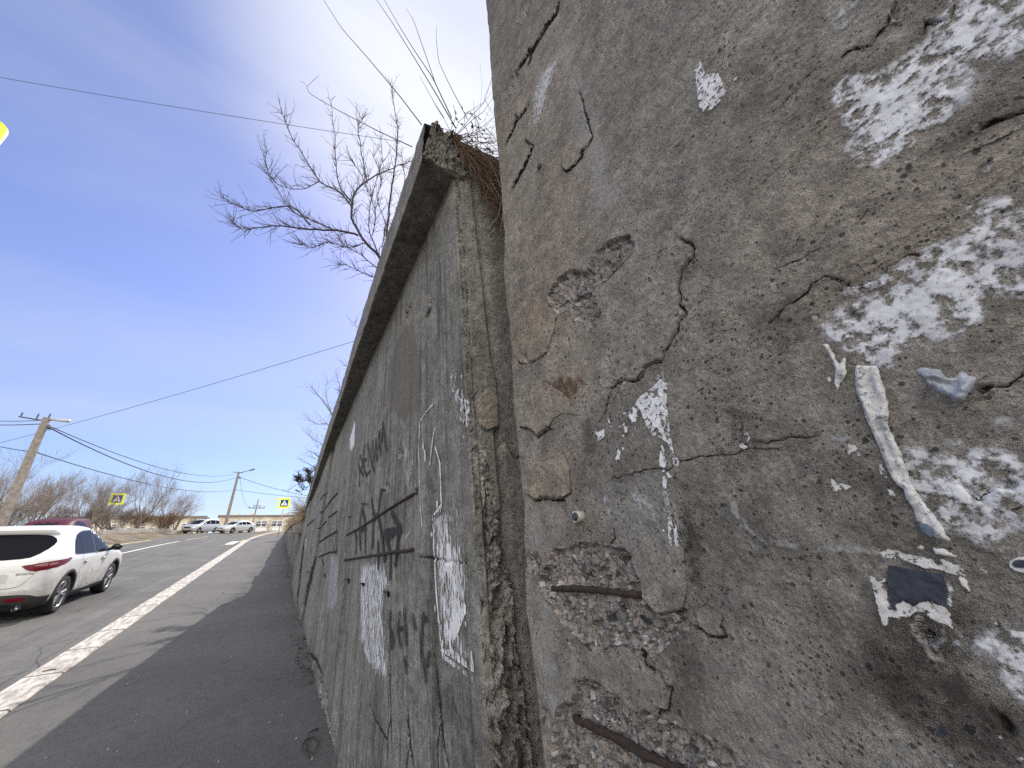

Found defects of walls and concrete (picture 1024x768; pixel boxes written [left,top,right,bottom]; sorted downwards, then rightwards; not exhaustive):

crack [505,1,559,189]
flaking render [450,375,499,438]
spalling [510,234,635,364]
spalling [519,240,747,768]
crack [605,240,696,413]
crack [610,436,817,495]
crack [769,248,924,324]
spalling [478,443,534,768]